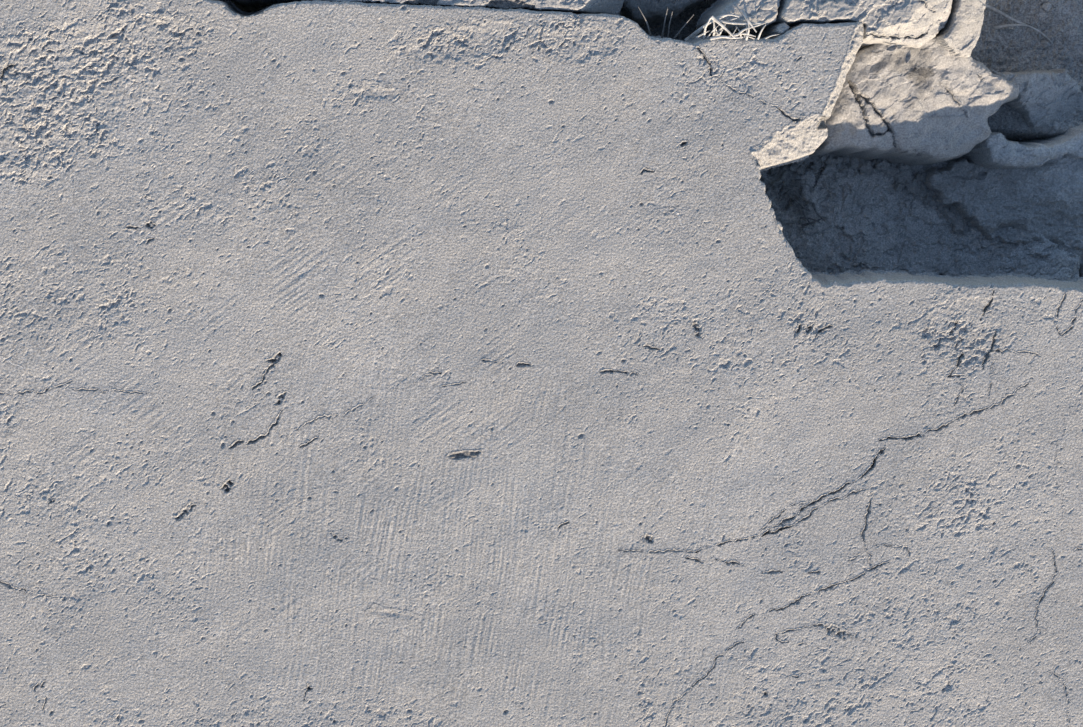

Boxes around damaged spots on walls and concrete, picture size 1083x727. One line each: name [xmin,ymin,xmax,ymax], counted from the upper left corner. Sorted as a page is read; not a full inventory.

peeling [749,22,864,169]
peeling [774,215,789,249]
crack [1054,292,1083,337]
crack [618,348,1041,727]